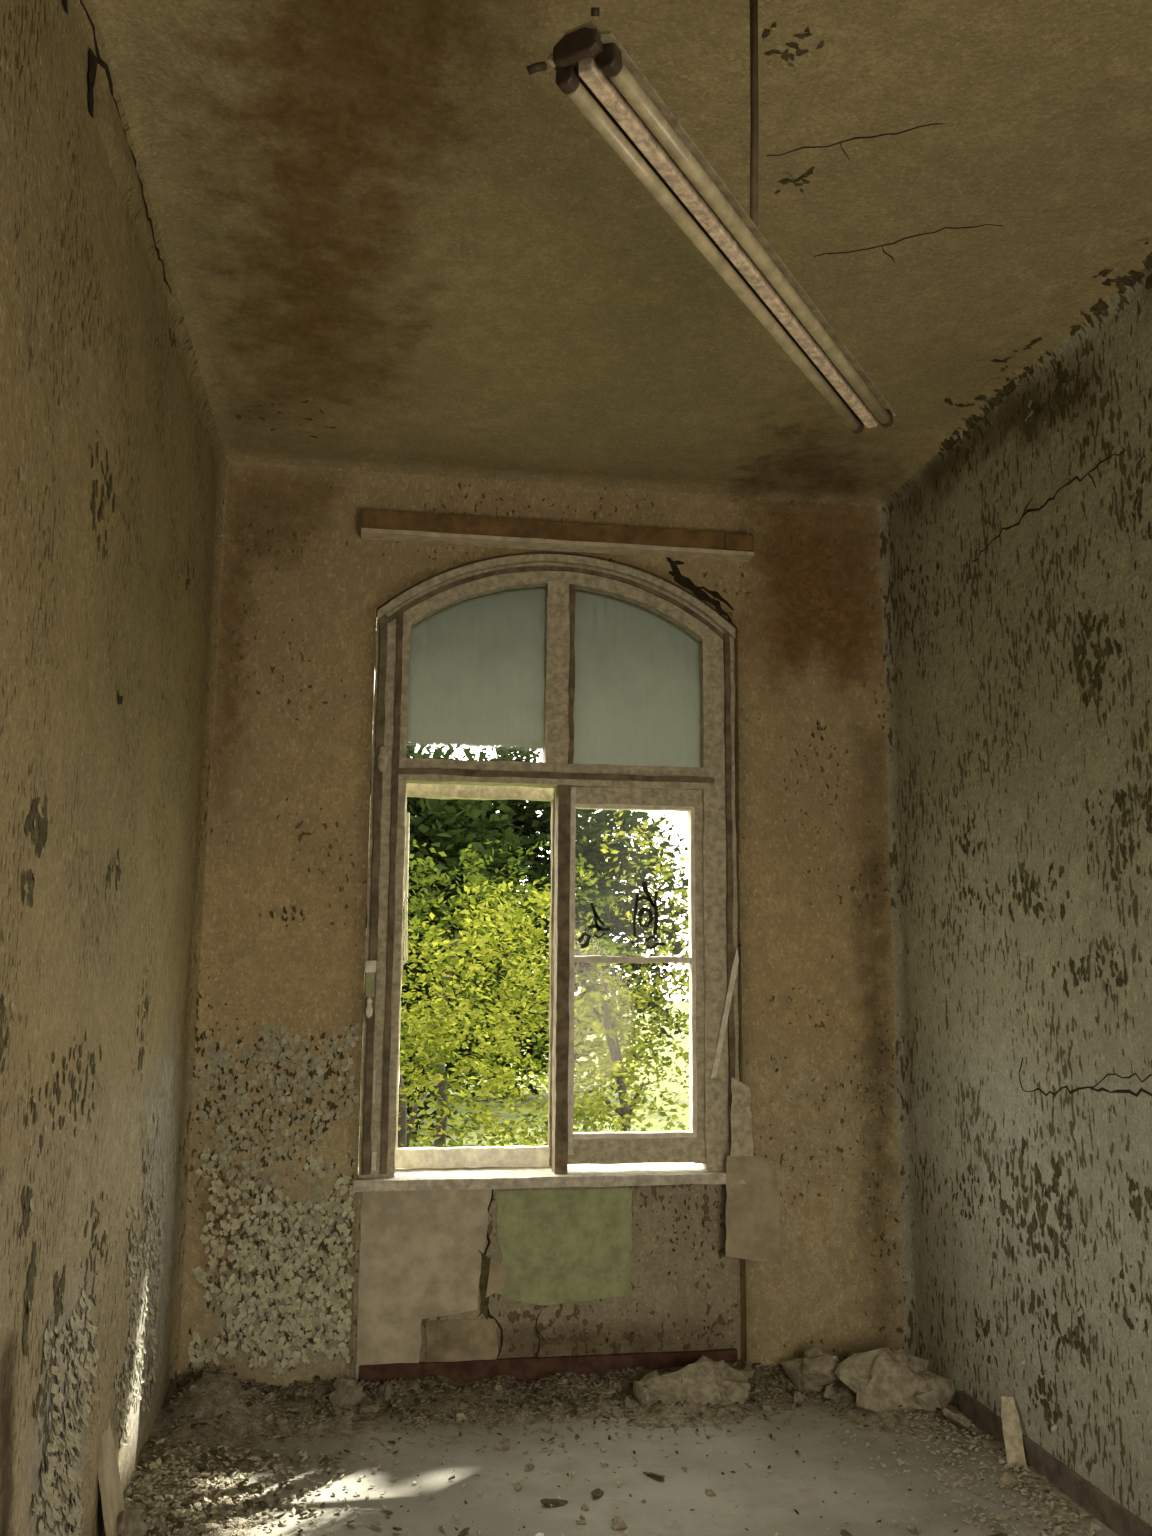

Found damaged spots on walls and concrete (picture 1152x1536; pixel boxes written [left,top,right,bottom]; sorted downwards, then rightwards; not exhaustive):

crack [767,123,943,159]
crack [814,224,1002,263]
crack [666,557,734,623]
leakage [758,506,872,670]
peeling [958,862,1068,927]
peeling [1052,950,1128,999]
peeling [22,1032,103,1152]
crack [1019,1057,1152,1097]
peeling [187,992,498,1387]
crack [484,1189,493,1255]
peeling [945,1136,1091,1432]
peeling [19,1113,166,1536]